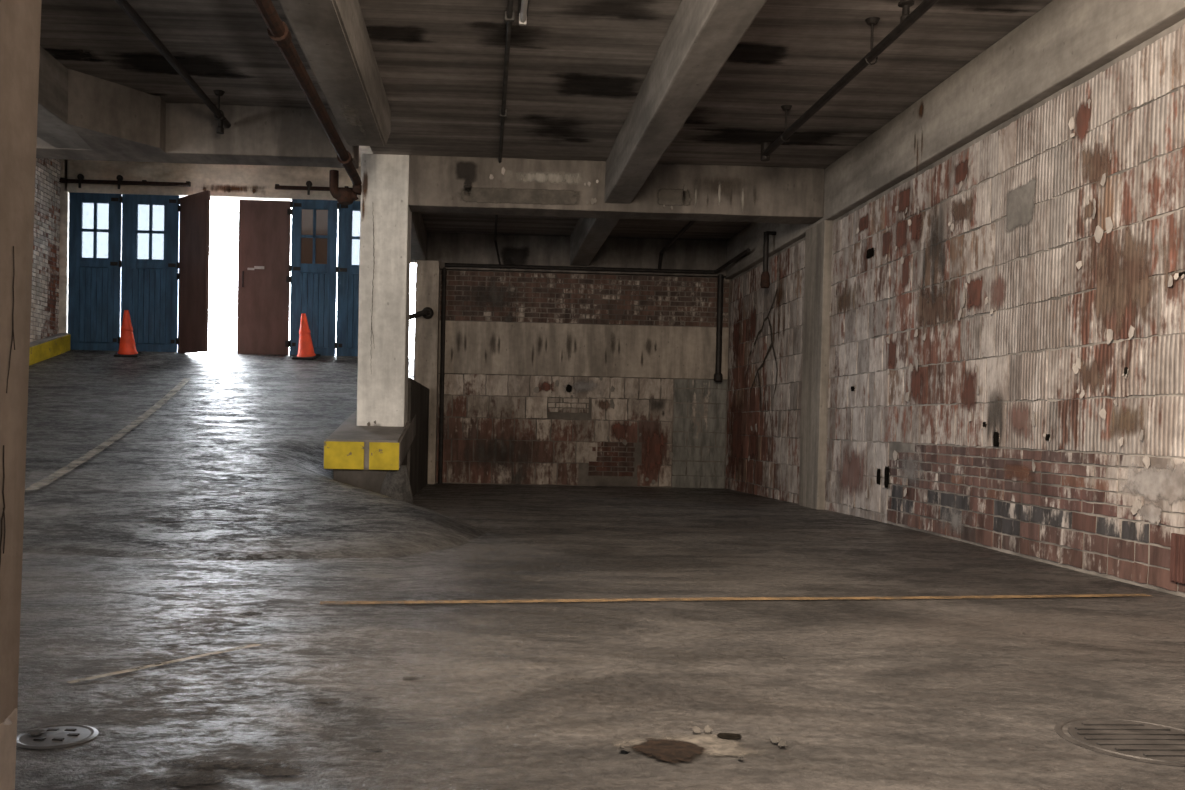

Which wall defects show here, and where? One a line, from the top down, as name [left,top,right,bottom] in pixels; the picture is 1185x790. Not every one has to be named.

leakage [558,73,639,96]
peeling [856,214,868,234]
peeling [948,160,972,232]
peeling [1068,99,1185,344]
peeling [866,187,1004,341]
peeling [886,336,896,375]
peeling [905,357,923,402]
peeling [962,365,1000,447]
peeling [1011,405,1050,442]
peeling [1072,358,1144,447]